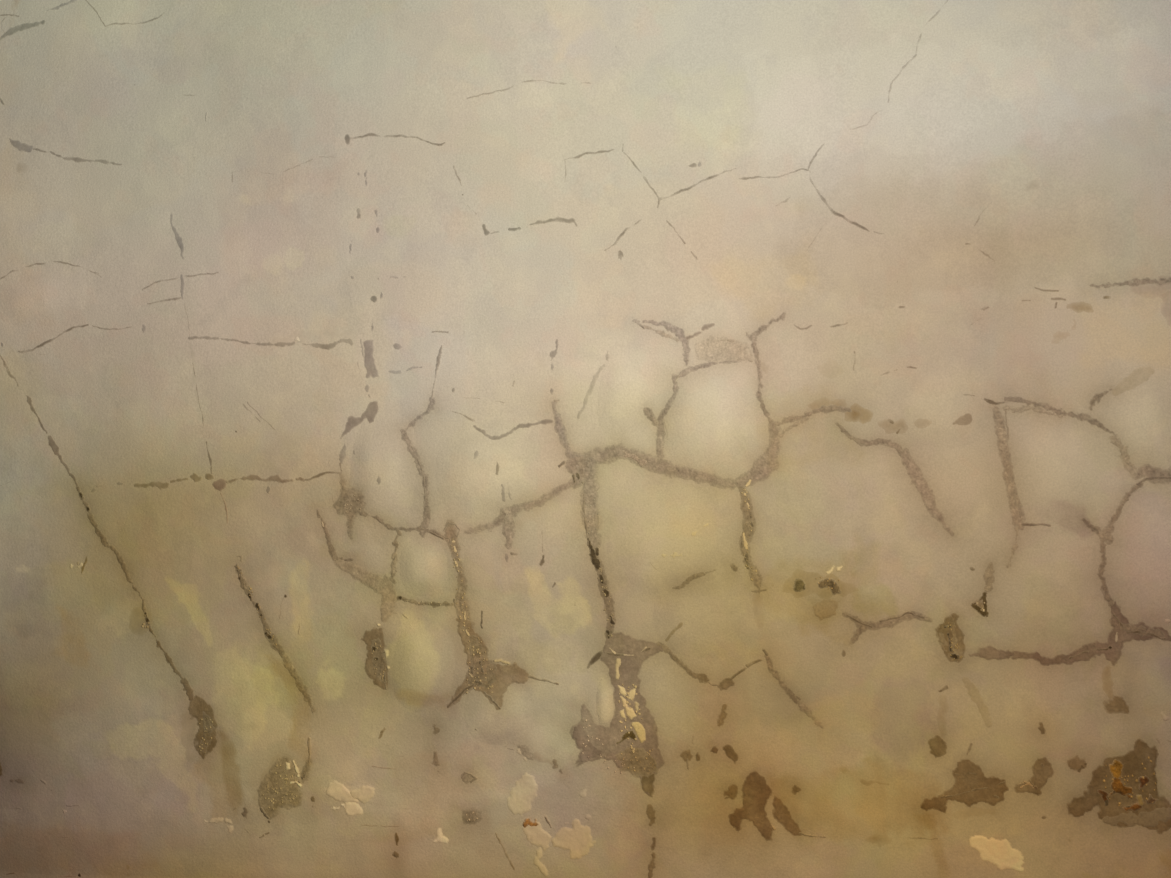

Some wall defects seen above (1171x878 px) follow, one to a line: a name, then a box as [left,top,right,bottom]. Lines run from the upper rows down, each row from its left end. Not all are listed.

crack [564,143,884,260]
crack [0,132,578,701]
crack [316,312,954,729]
crack [963,366,1171,607]
crack [234,555,316,766]
flaking render [447,617,560,710]
flaking render [569,631,739,797]
flaking render [934,601,1171,666]
water stain [1101,665,1130,714]
water stain [646,804,657,878]
flaking render [723,771,826,841]
flaking render [920,735,1055,820]